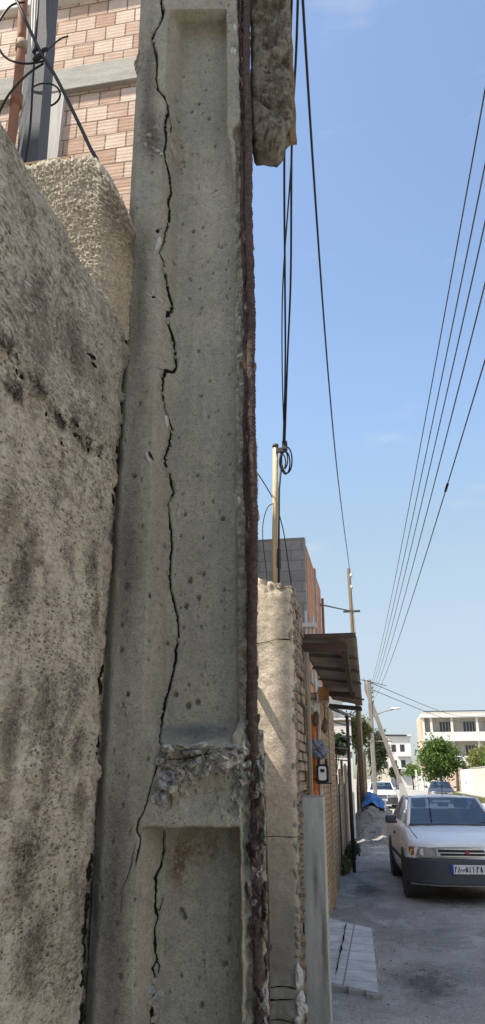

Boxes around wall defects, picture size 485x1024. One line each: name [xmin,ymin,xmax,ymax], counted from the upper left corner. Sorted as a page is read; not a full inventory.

crack [120,0,208,1024]
rust [243,416,258,488]
spalling [150,712,273,967]
spalling [238,980,273,1024]